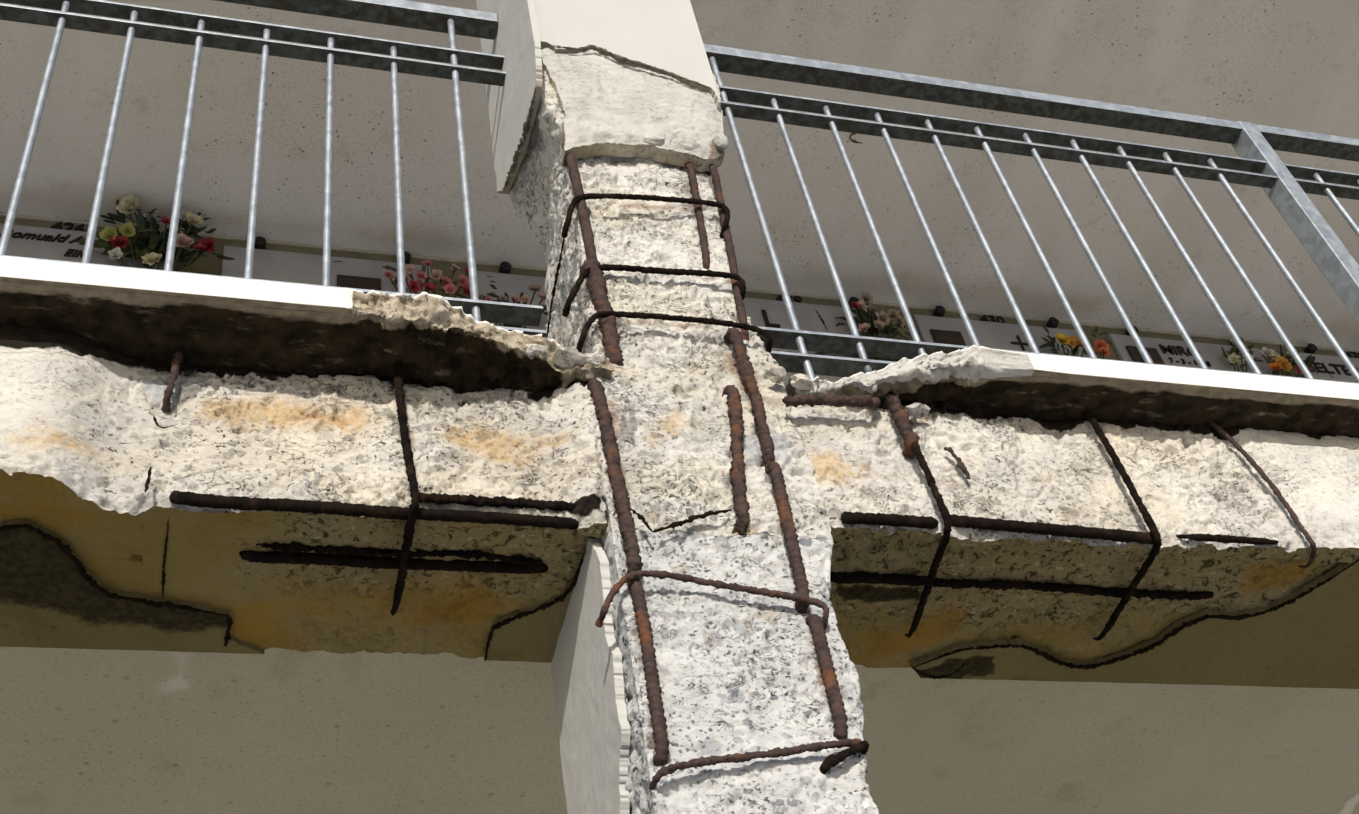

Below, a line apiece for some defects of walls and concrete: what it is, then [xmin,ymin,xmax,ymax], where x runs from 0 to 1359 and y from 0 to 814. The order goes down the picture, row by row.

rust [546,130,725,332]
damp [0,503,228,701]
crack [0,520,233,647]
crack [144,467,152,493]
spalling [0,351,639,709]
rust [160,260,779,545]
rust [612,570,682,814]
crack [612,501,731,533]
rust [794,603,860,750]
spalling [405,47,1359,814]
rust [886,405,960,534]
rust [1085,422,1168,540]